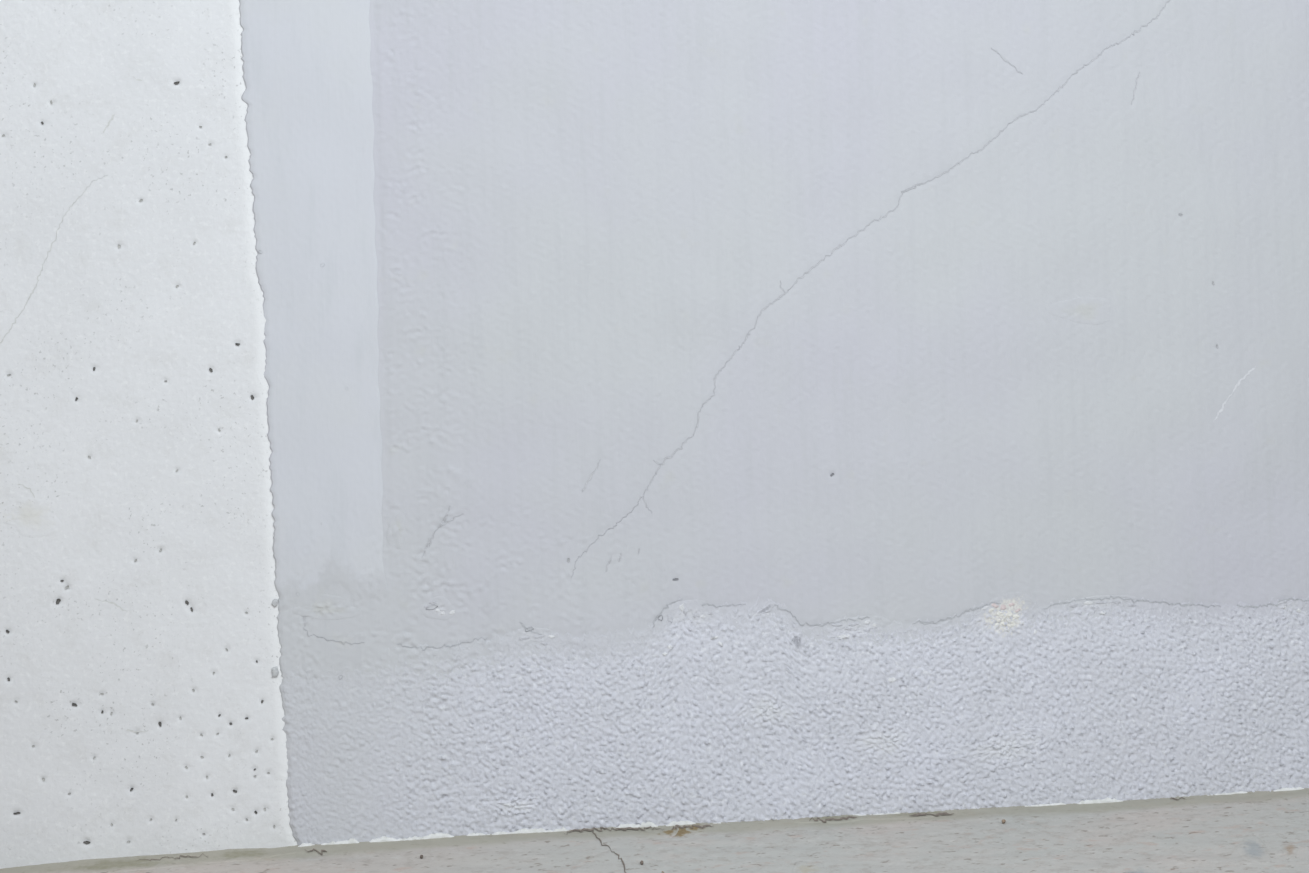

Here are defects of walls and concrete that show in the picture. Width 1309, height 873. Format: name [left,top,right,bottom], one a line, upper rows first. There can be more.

crack [571,0,1170,578]
peeling [1025,797,1122,807]
crack [909,810,954,818]
crack [809,815,857,823]
peeling [616,820,696,828]
crack [564,825,712,873]
crack [137,853,207,861]